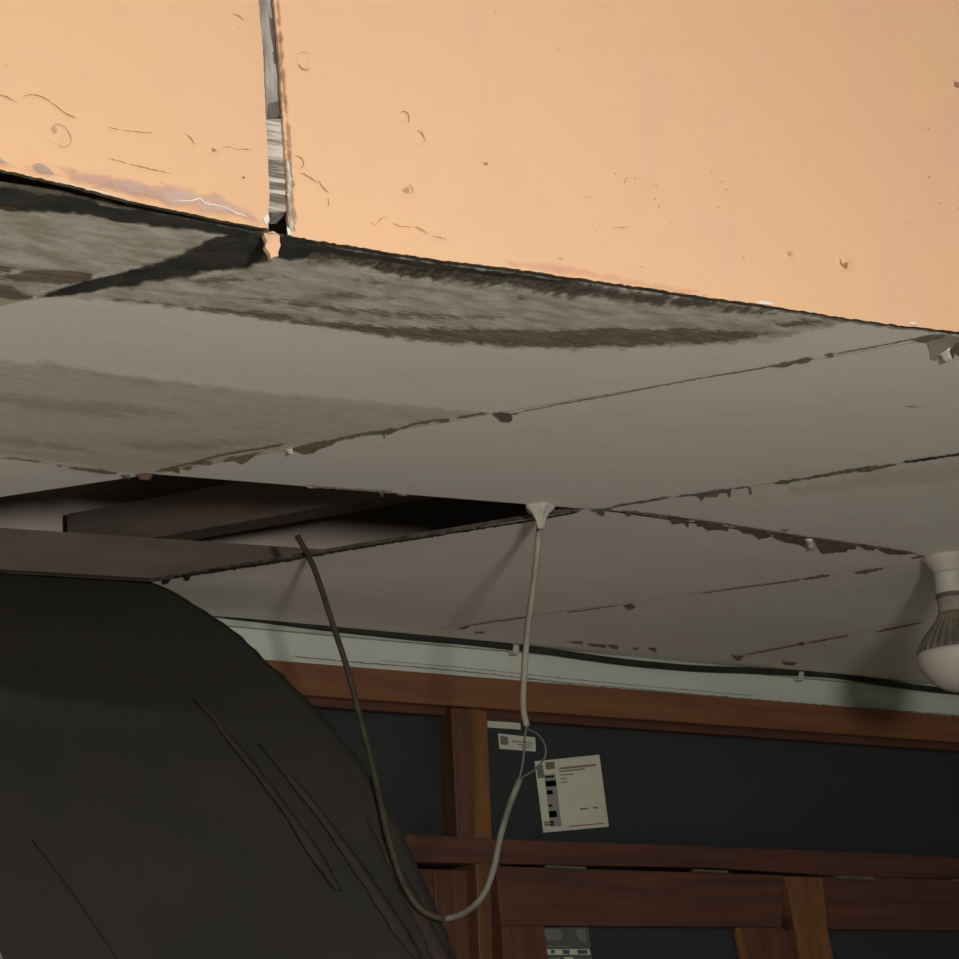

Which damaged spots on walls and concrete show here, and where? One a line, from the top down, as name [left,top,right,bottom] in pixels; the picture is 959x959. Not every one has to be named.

peeling [34,164,250,217]
damp [0,187,835,350]
peeling [824,334,959,363]
flaking render [0,357,813,532]
peeling [773,453,959,484]
flaking render [192,497,529,549]
peeling [592,487,924,559]
peeling [701,574,830,594]
peeling [568,641,618,650]
peeling [731,635,849,661]